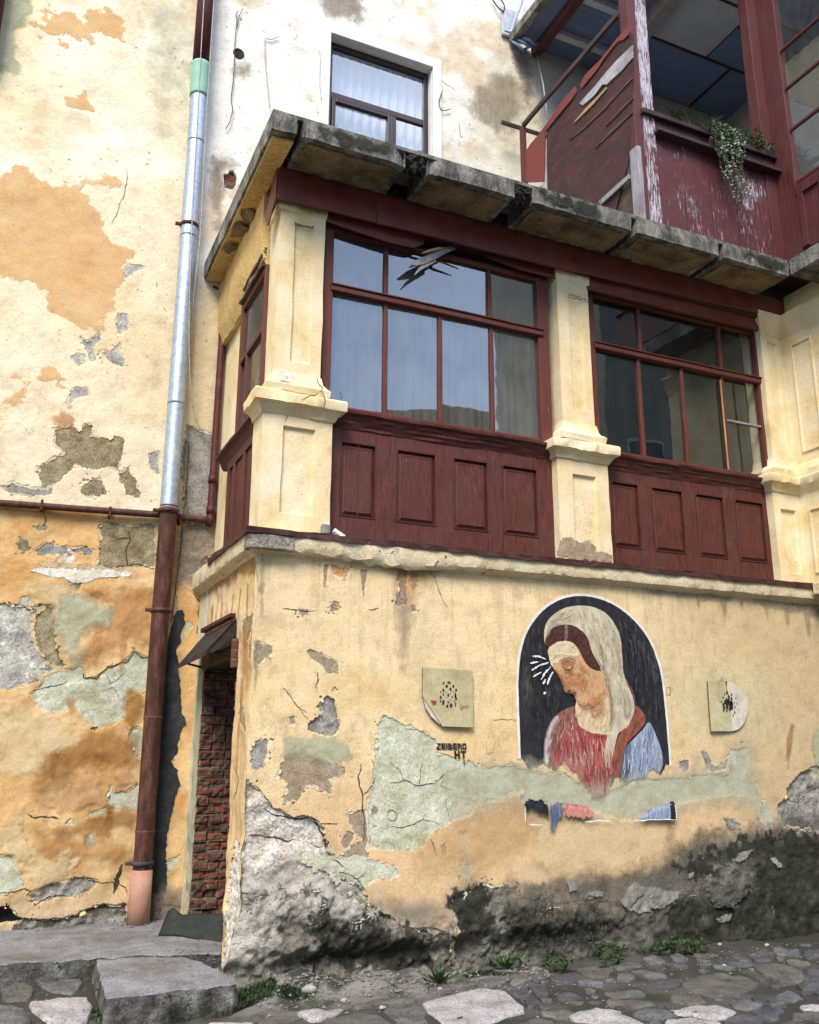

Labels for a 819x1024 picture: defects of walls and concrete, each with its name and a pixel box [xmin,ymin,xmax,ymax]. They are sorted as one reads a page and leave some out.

leakage [474,43,533,130]
peeling [123,262,146,279]
peeling [0,423,141,498]
peeling [16,521,158,578]
flaking render [557,537,613,563]
peeling [0,596,148,760]
flaking render [0,854,128,930]
peeling [89,782,139,818]
crack [233,767,458,965]
crack [357,759,499,842]
peeling [221,696,819,971]
leakage [446,816,819,964]